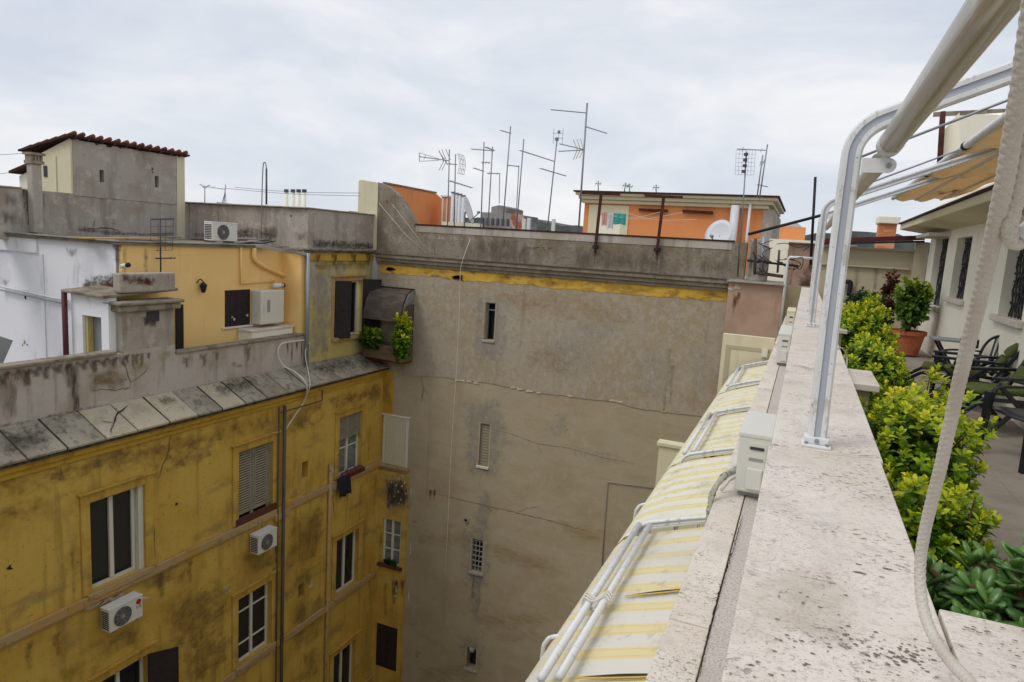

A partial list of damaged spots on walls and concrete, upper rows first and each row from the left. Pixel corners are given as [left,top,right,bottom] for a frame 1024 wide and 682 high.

damp [0,353,149,411]
crack [92,363,148,431]